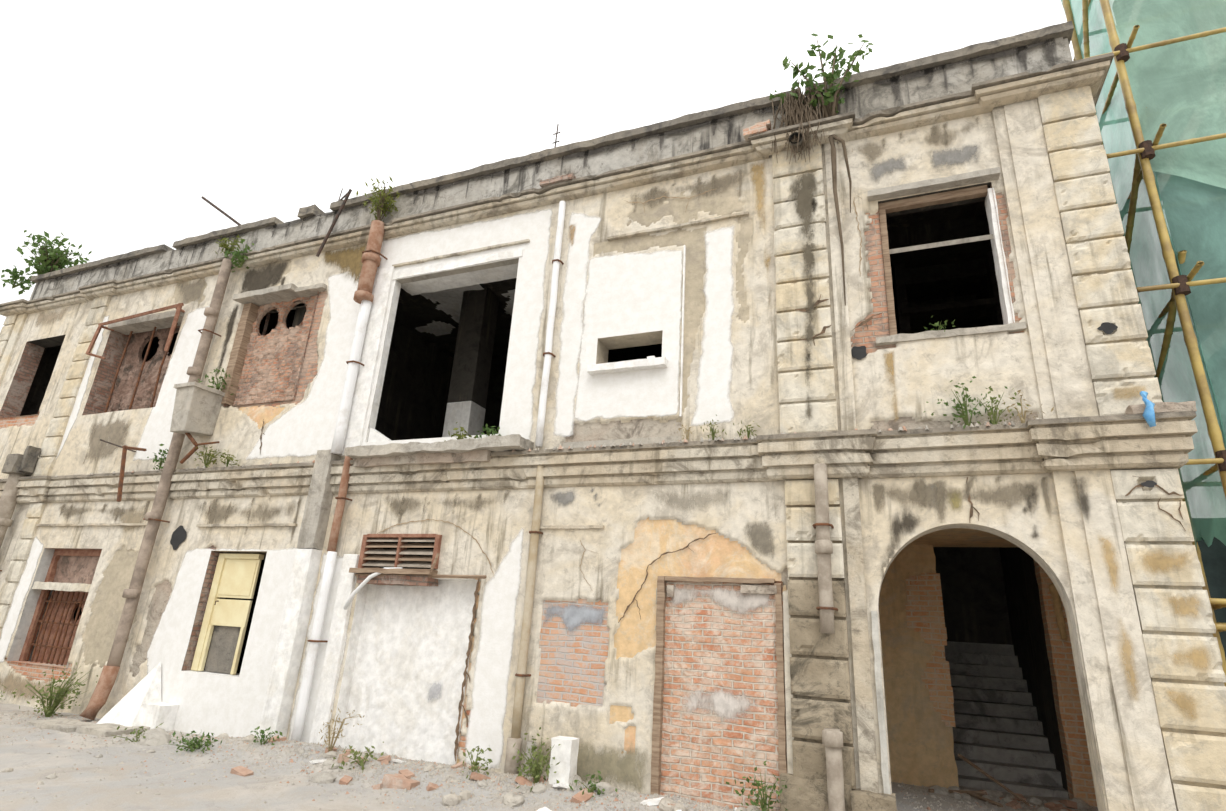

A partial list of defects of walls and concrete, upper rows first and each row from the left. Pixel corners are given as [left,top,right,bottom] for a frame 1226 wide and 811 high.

water stain [739,164,764,210]
water stain [790,172,817,379]
flaking render [227,291,328,429]
water stain [873,484,884,510]
water stain [914,479,973,519]
water stain [1024,477,1051,513]
water stain [1073,479,1089,518]
water stain [883,513,918,575]
crack [618,533,716,623]
peeling [5,546,173,683]
peeling [536,517,788,754]